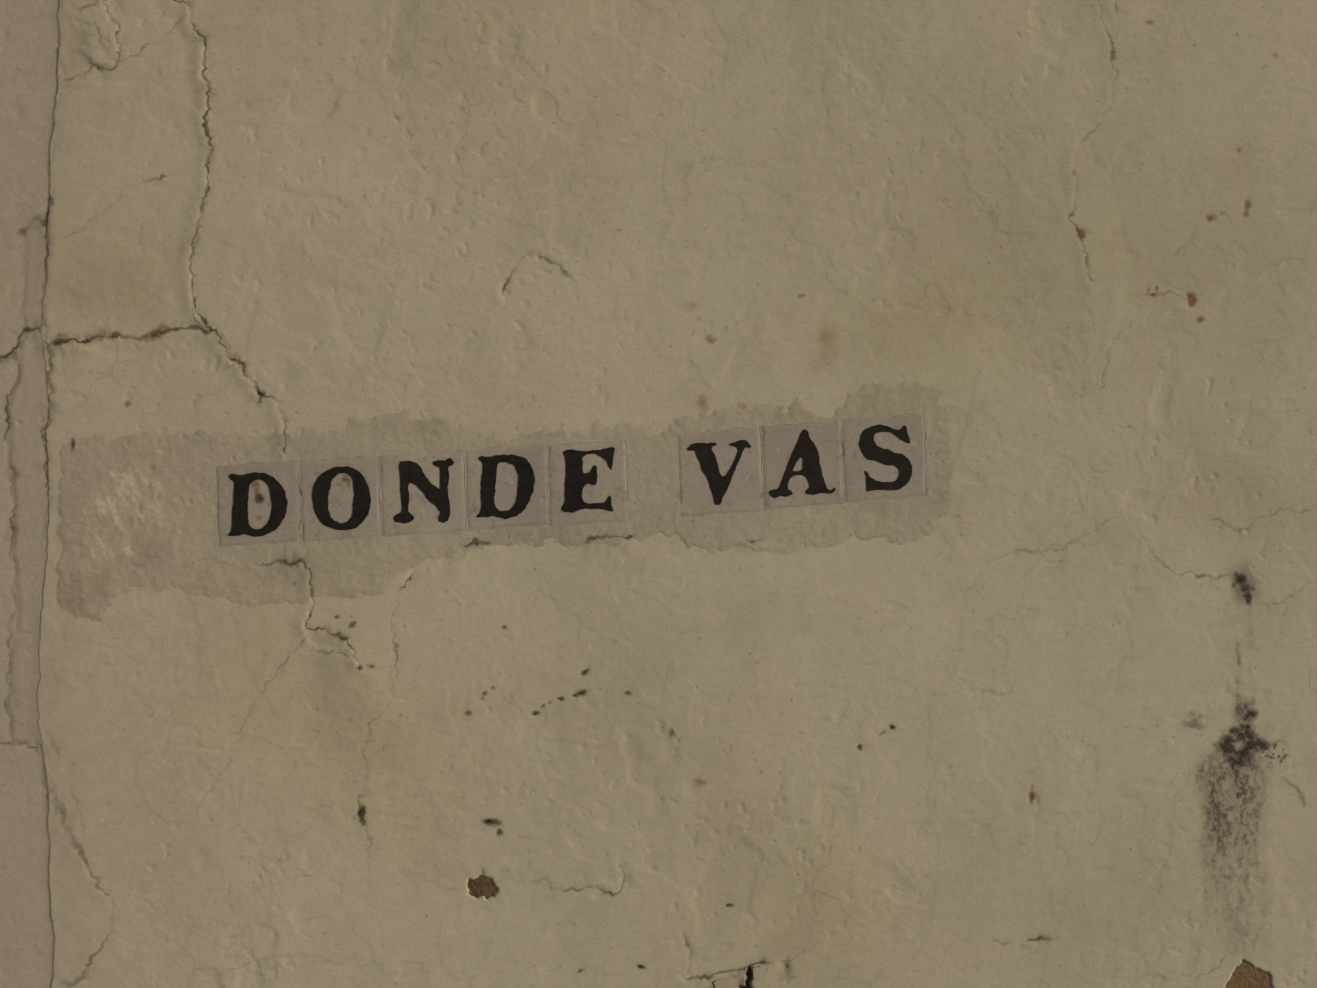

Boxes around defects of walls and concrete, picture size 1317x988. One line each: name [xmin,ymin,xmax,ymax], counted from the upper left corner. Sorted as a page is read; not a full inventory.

crack [4,263,265,396]
water stain [1236,574,1251,604]
water stain [1202,704,1286,849]
spalling [713,965,769,988]
spalling [1225,960,1272,988]